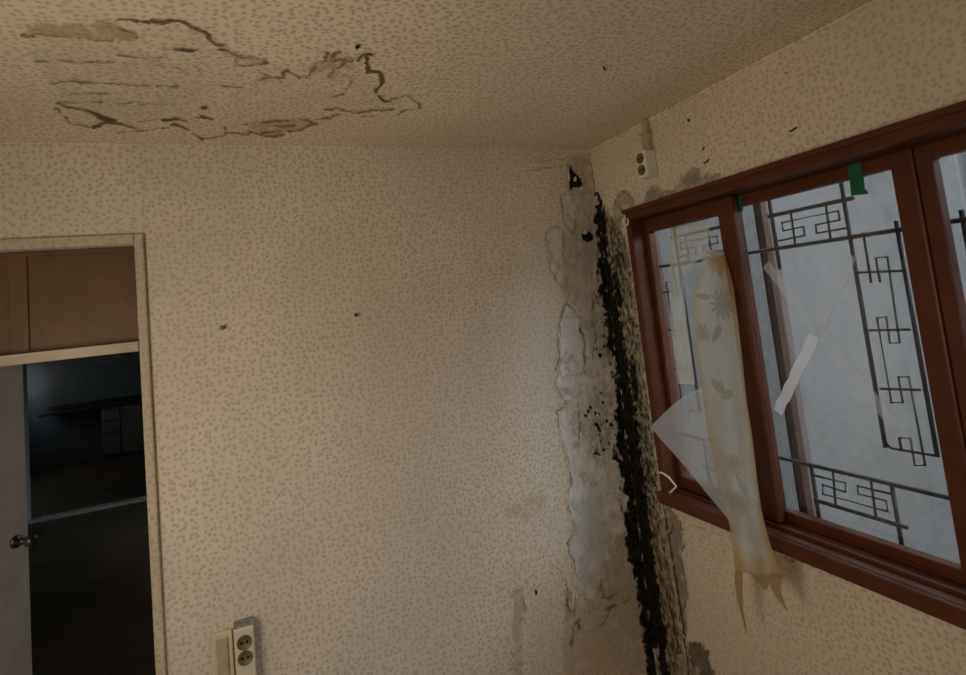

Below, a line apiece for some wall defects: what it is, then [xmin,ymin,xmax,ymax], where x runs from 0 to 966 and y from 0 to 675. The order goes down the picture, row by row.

peeling [559,303,597,378]
leakage [545,191,715,675]